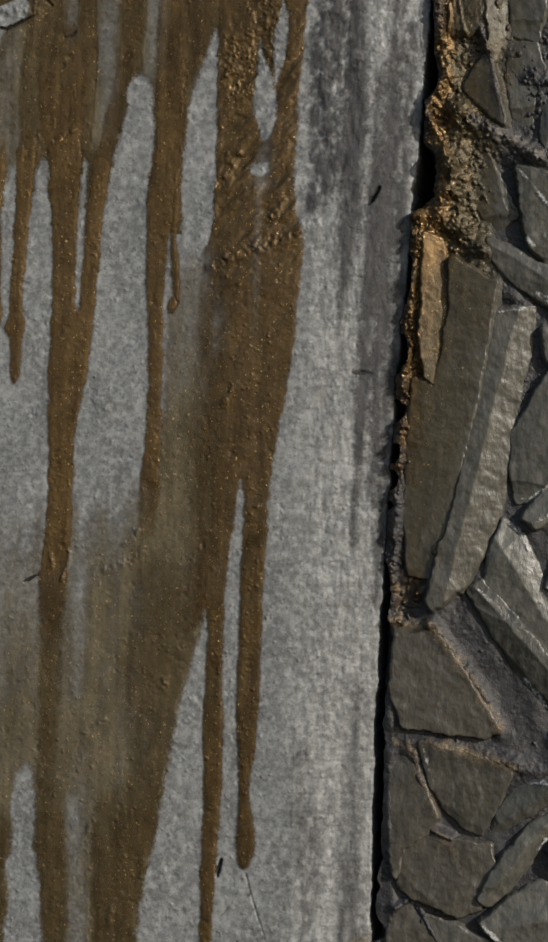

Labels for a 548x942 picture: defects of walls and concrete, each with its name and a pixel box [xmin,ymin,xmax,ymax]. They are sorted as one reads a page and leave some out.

crack [384,625,392,693]